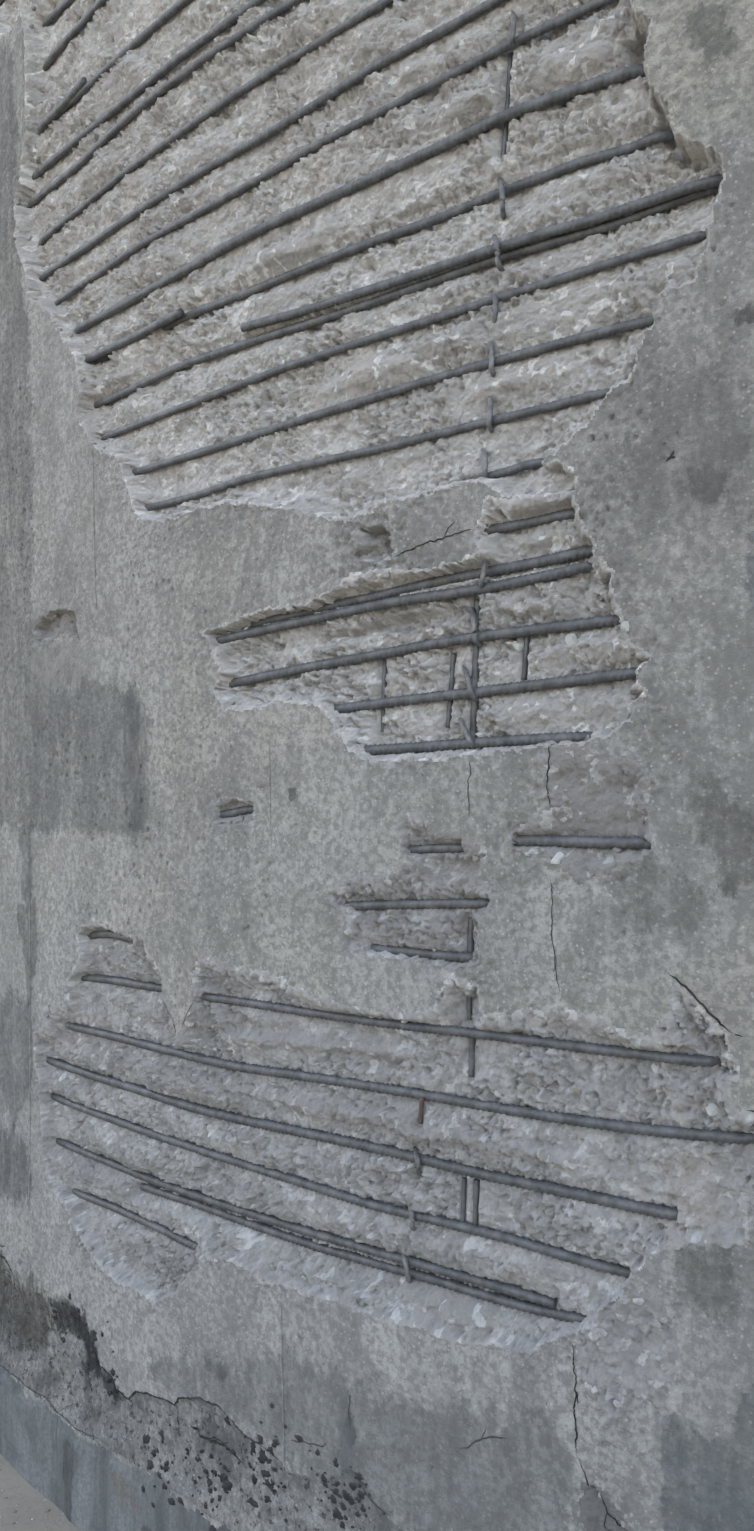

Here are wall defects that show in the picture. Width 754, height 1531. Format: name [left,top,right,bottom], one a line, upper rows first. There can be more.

spalling [0,0,726,886]
spalling [33,812,754,1419]
crack [0,1365,97,1438]
crack [88,1328,388,1515]
crack [572,1349,627,1531]